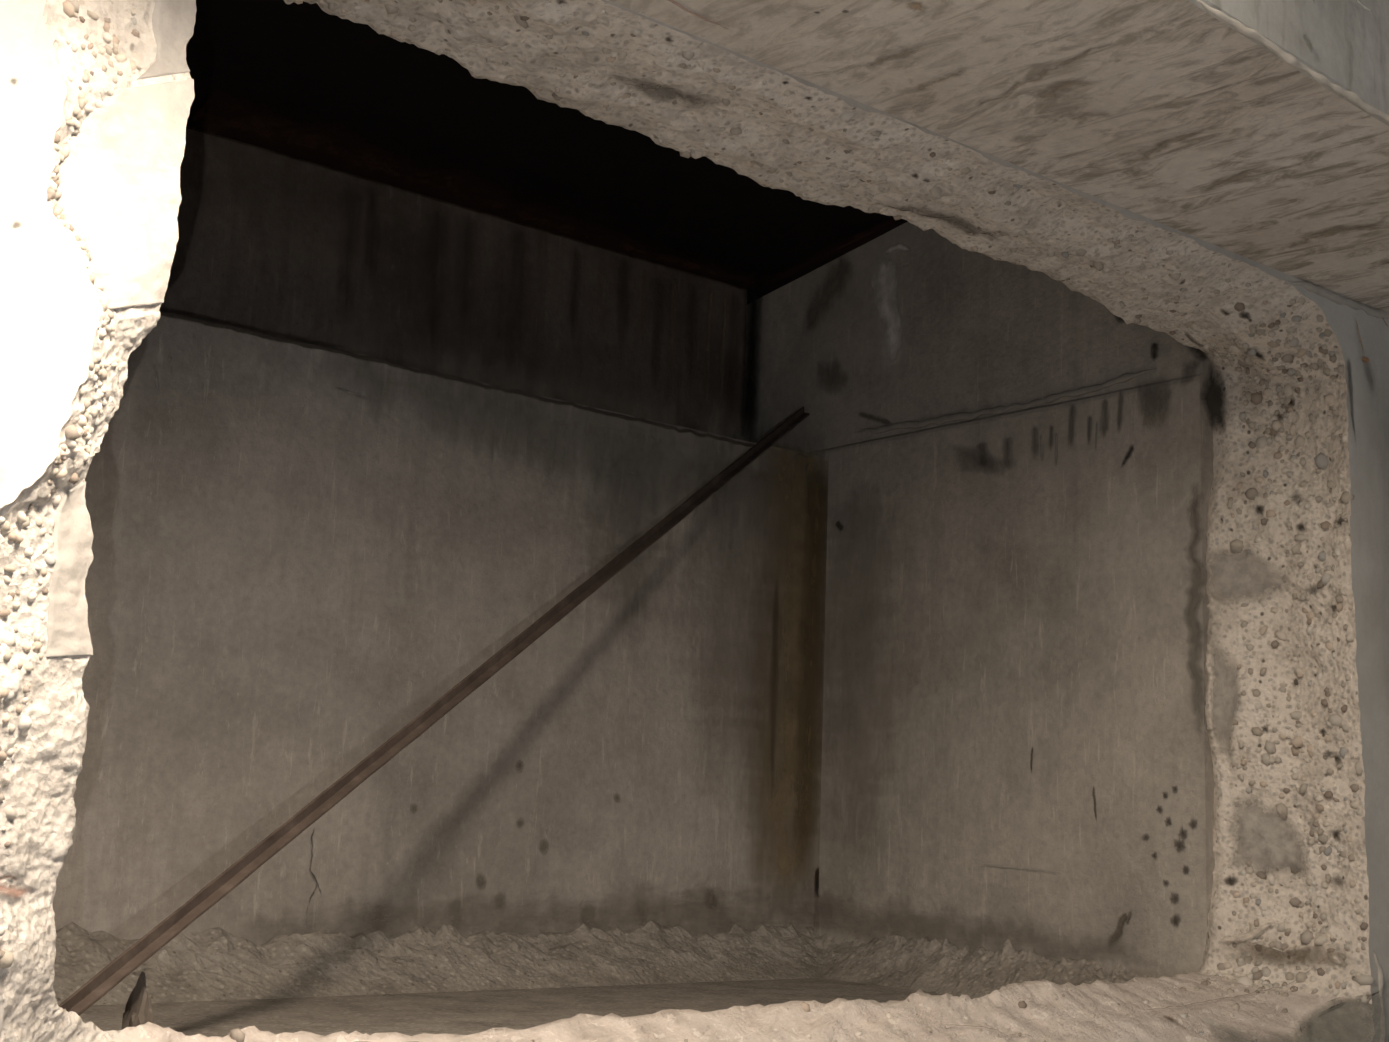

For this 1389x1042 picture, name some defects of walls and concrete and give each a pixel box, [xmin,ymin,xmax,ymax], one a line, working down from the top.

spalling [0,0,197,1042]
water stain [276,893,758,936]
spalling [110,296,1380,1042]
water stain [742,289,760,439]
spalling [283,0,1304,346]
water stain [765,449,1119,956]